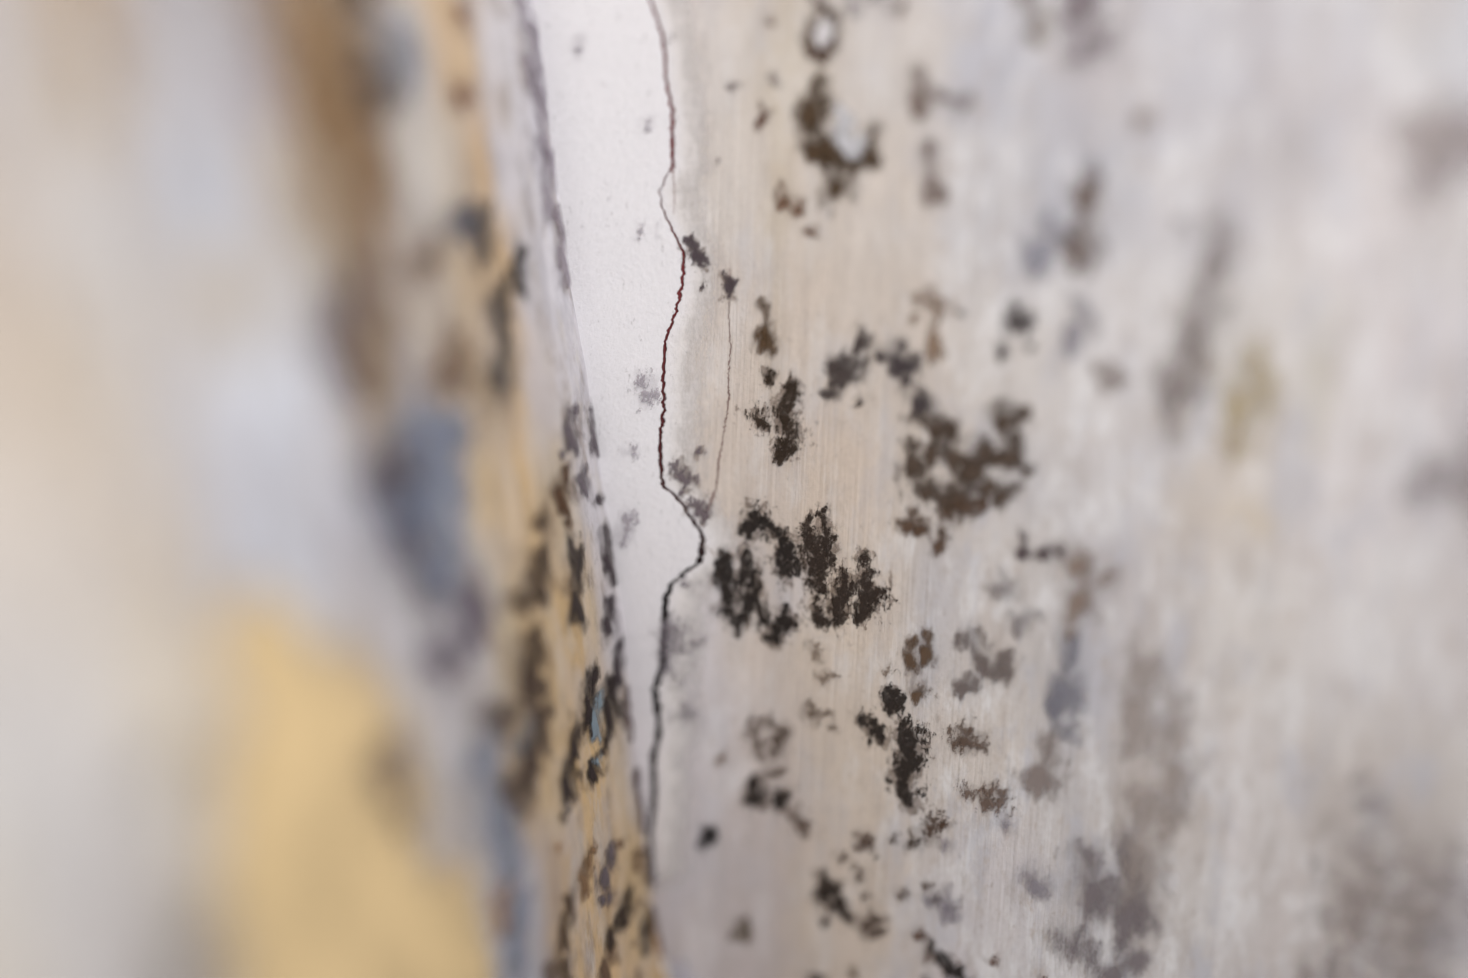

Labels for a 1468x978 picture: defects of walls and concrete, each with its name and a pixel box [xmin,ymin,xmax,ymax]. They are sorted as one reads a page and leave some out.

water stain [795,1,881,199]
water stain [682,232,739,299]
water stain [668,445,713,527]
crack [646,0,743,978]
water stain [710,499,898,648]
water stain [744,291,1037,557]
water stain [472,404,653,978]
water stain [697,826,719,850]
water stain [718,697,839,840]
water stain [811,617,1023,941]
water stain [957,529,1107,829]
water stain [913,927,964,978]